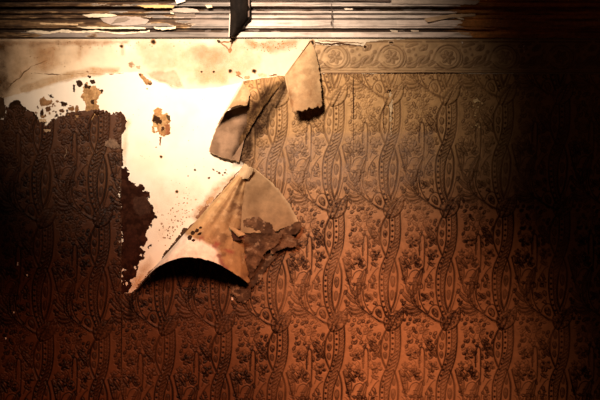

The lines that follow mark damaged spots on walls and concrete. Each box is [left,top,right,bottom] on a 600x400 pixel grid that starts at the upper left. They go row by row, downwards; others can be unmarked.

peeling [139,0,199,18]
peeling [27,14,176,34]
peeling [73,71,103,94]
peeling [128,61,152,90]
peeling [37,94,79,132]
peeling [133,196,151,217]